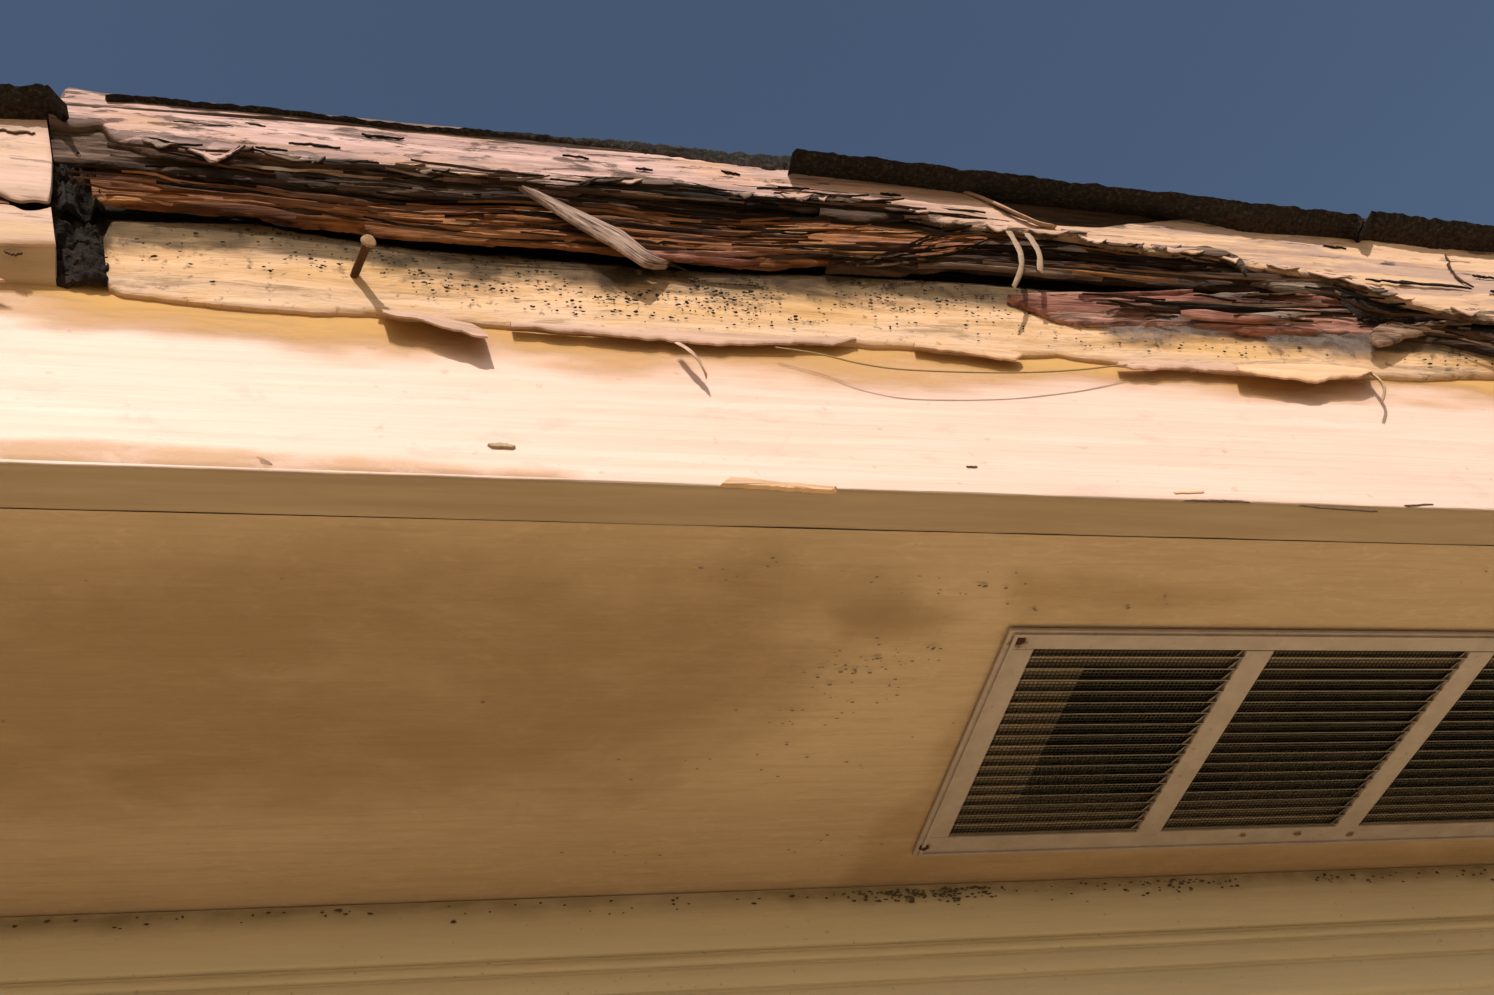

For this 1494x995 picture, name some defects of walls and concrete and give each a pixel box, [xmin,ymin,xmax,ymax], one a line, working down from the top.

peeling [142,139,368,164]
peeling [569,176,643,186]
peeling [963,191,1240,264]
peeling [380,309,488,338]
peeling [510,321,856,346]
damp [0,222,1494,396]
peeling [1007,292,1376,338]
peeling [913,342,1022,362]
peeling [1117,360,1373,384]
damp [811,637,942,725]
damp [789,886,1018,905]
damp [1070,878,1239,902]